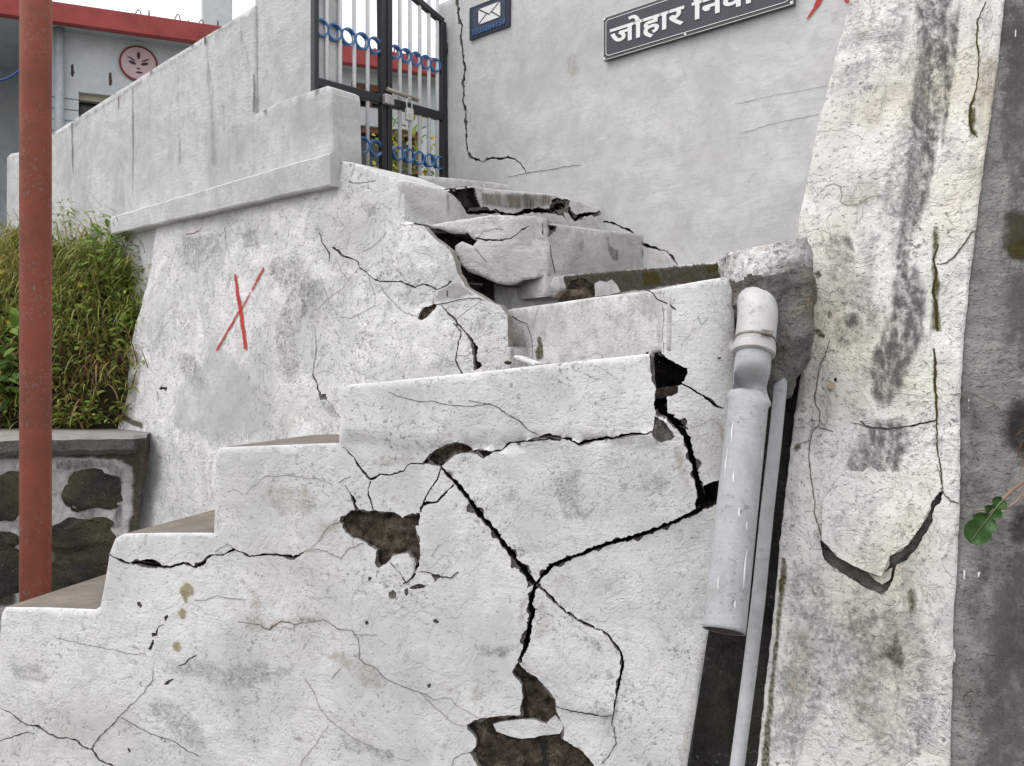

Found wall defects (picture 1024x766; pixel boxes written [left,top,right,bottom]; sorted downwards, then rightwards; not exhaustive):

crack [456,0,579,177]
flaking render [444,186,481,214]
crack [466,199,678,265]
water stain [870,0,958,402]
crack [313,224,483,418]
flaking render [554,278,621,302]
flaking render [646,352,687,442]
crack [793,340,936,547]
water stain [848,422,904,472]
flaking render [341,507,440,599]
crack [108,383,723,765]
flaking render [467,655,594,766]